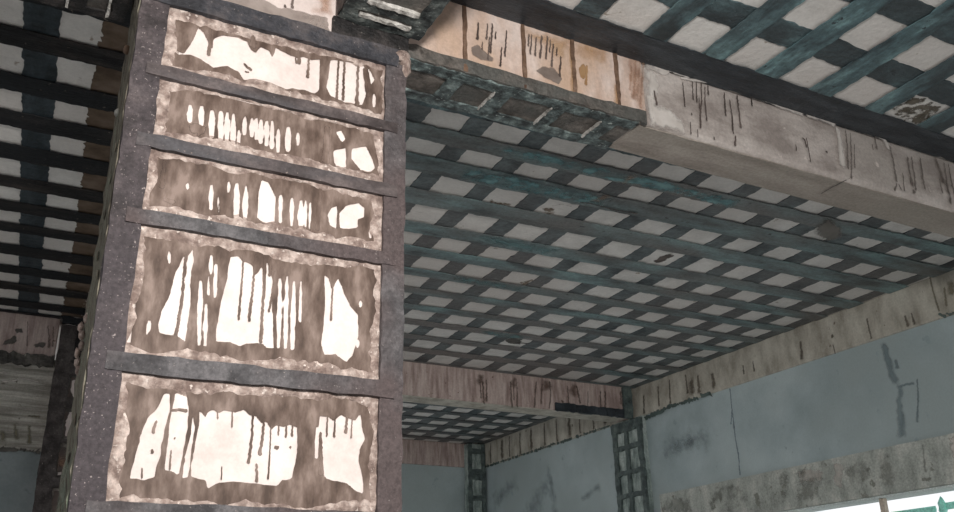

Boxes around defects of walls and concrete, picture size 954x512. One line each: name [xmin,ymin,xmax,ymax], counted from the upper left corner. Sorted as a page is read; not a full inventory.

spalling [450,0,954,167]
spalling [403,97,954,388]